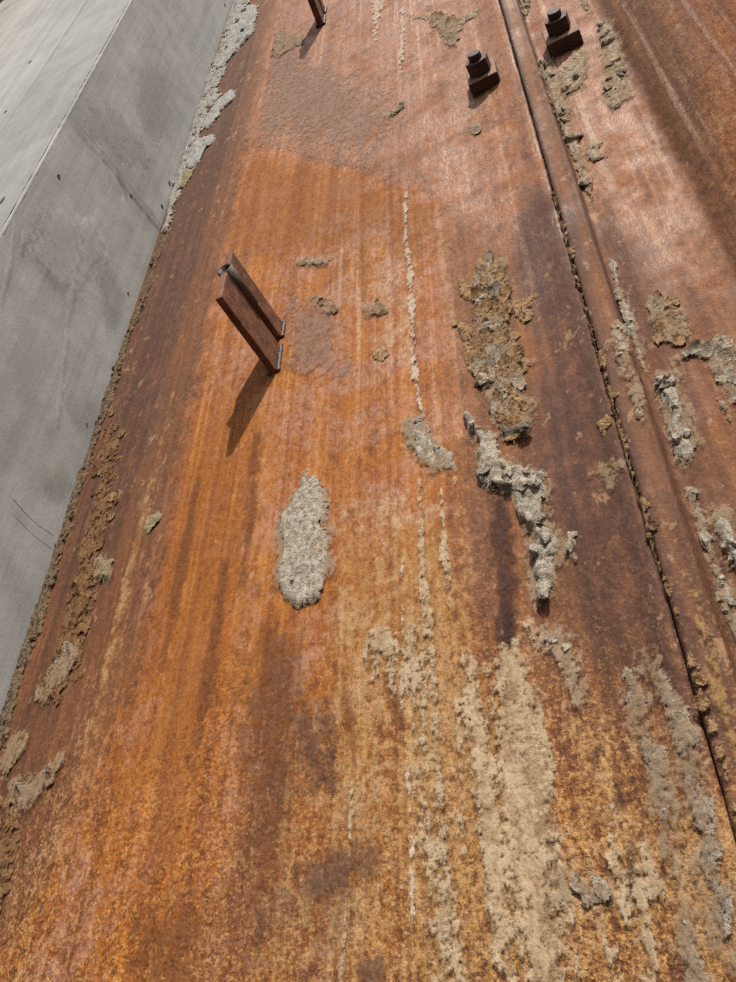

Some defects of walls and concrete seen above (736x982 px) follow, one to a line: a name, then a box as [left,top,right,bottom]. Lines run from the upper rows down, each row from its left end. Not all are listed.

corrosion [406,8,479,46]
corrosion [311,294,338,315]
corrosion [362,298,389,317]
corrosion [451,249,538,442]
corrosion [551,189,674,596]
corrosion [645,289,692,347]
corrosion [29,408,125,708]
corrosion [491,495,519,650]
corrosion [687,651,731,781]
corrosion [0,730,66,922]
corrosion [625,848,639,893]